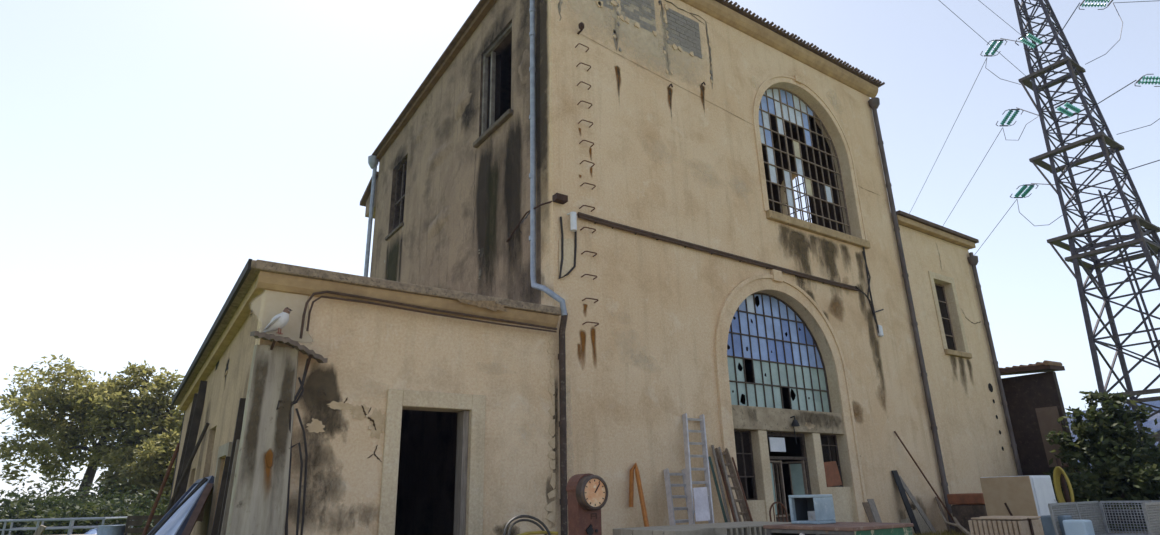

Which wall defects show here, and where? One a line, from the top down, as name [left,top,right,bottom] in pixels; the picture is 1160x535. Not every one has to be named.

damp [476,120,521,278]
damp [386,238,402,281]
damp [245,359,268,474]
damp [275,363,340,522]
peeling [306,418,325,433]
peeling [327,401,385,439]
corrosion [264,449,273,486]